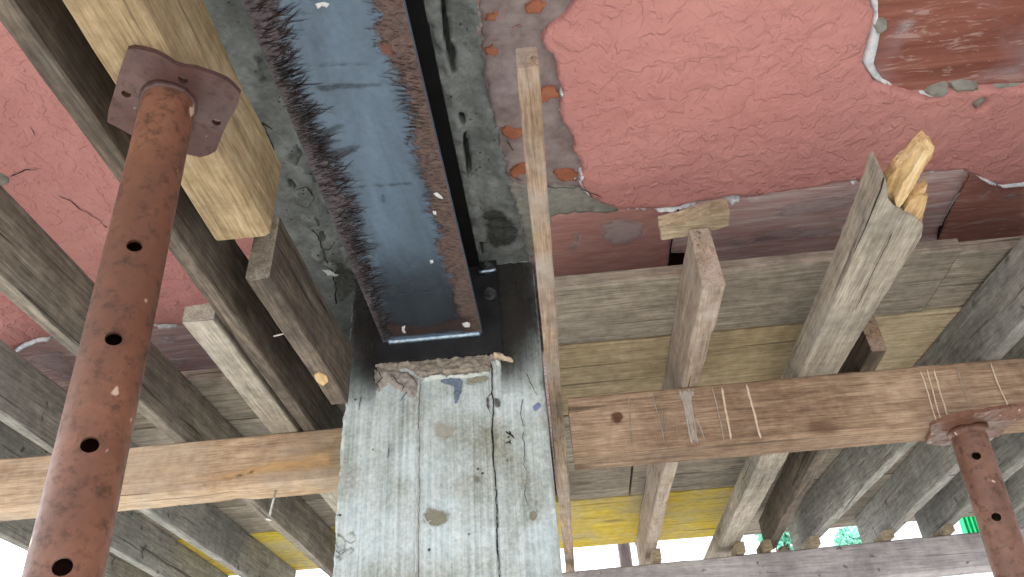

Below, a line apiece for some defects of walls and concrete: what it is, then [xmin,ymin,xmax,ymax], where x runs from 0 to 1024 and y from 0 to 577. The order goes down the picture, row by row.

flaking render [862,0,1024,108]
rust [241,0,482,340]
water stain [485,211,518,247]
flaking render [479,0,861,277]
flaking render [917,169,1024,242]
spalling [374,352,513,398]
crack [487,364,500,577]